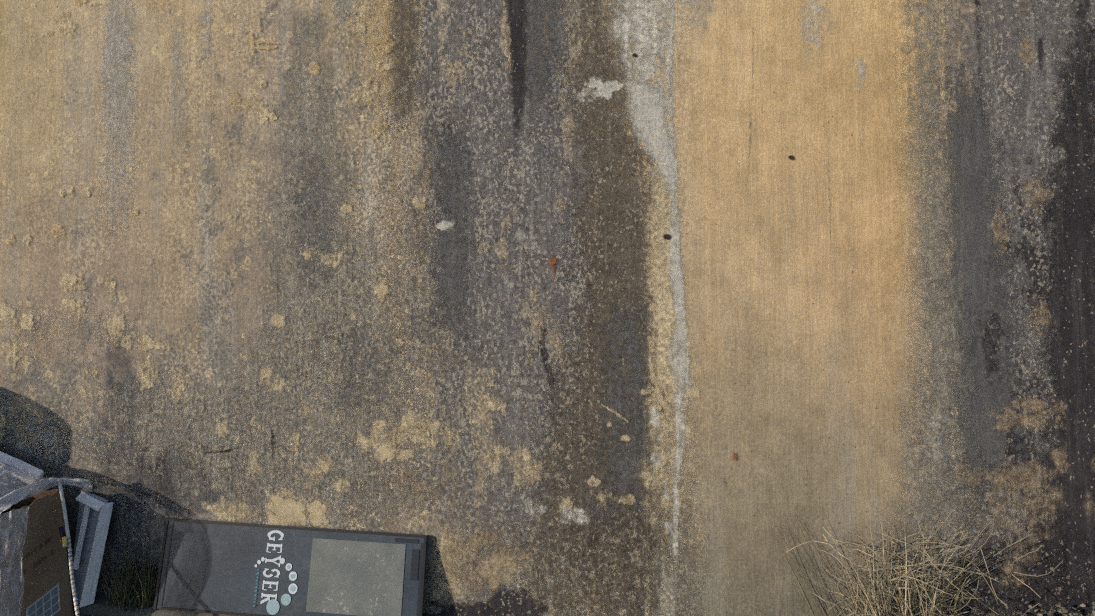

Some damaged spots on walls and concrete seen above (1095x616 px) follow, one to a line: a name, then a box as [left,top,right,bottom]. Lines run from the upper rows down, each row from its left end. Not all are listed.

leakage [388,0,700,616]
leakage [889,0,1095,616]